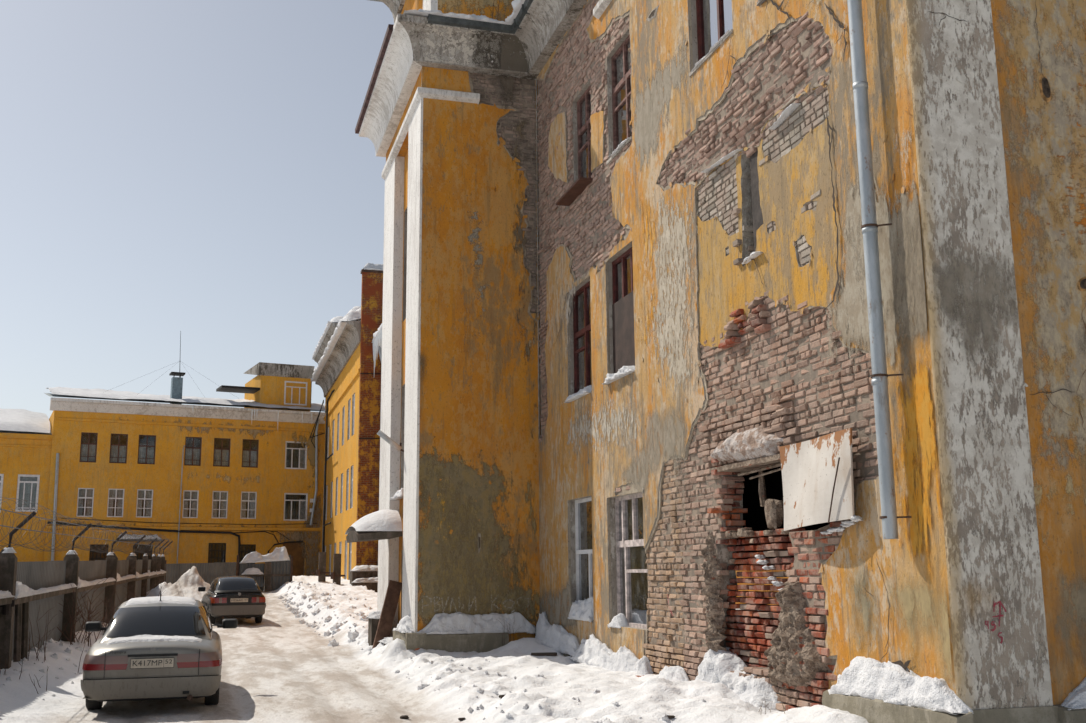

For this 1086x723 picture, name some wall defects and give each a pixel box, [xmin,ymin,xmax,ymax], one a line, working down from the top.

crack [757,0,846,61]
spalling [422,0,879,711]
crack [824,83,840,309]
damp [826,174,871,362]
damp [874,177,928,376]
damp [938,251,1018,354]
crack [1029,370,1086,429]
damp [417,447,576,636]
damp [892,584,952,677]